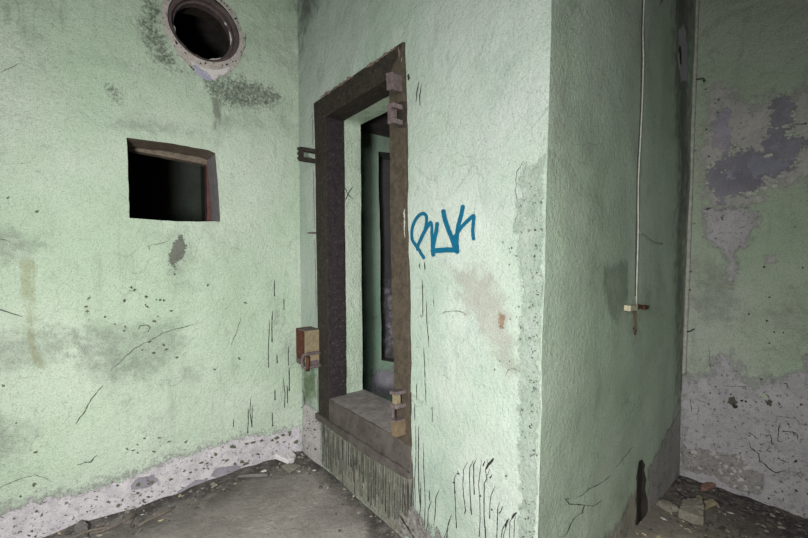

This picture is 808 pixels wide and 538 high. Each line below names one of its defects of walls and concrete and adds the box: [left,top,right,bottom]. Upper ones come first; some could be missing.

peeling [694,82,808,282]
spalling [513,154,545,538]
flaking render [0,377,323,538]
spalling [393,505,441,538]
crack [558,450,630,537]
flaking render [635,349,808,525]